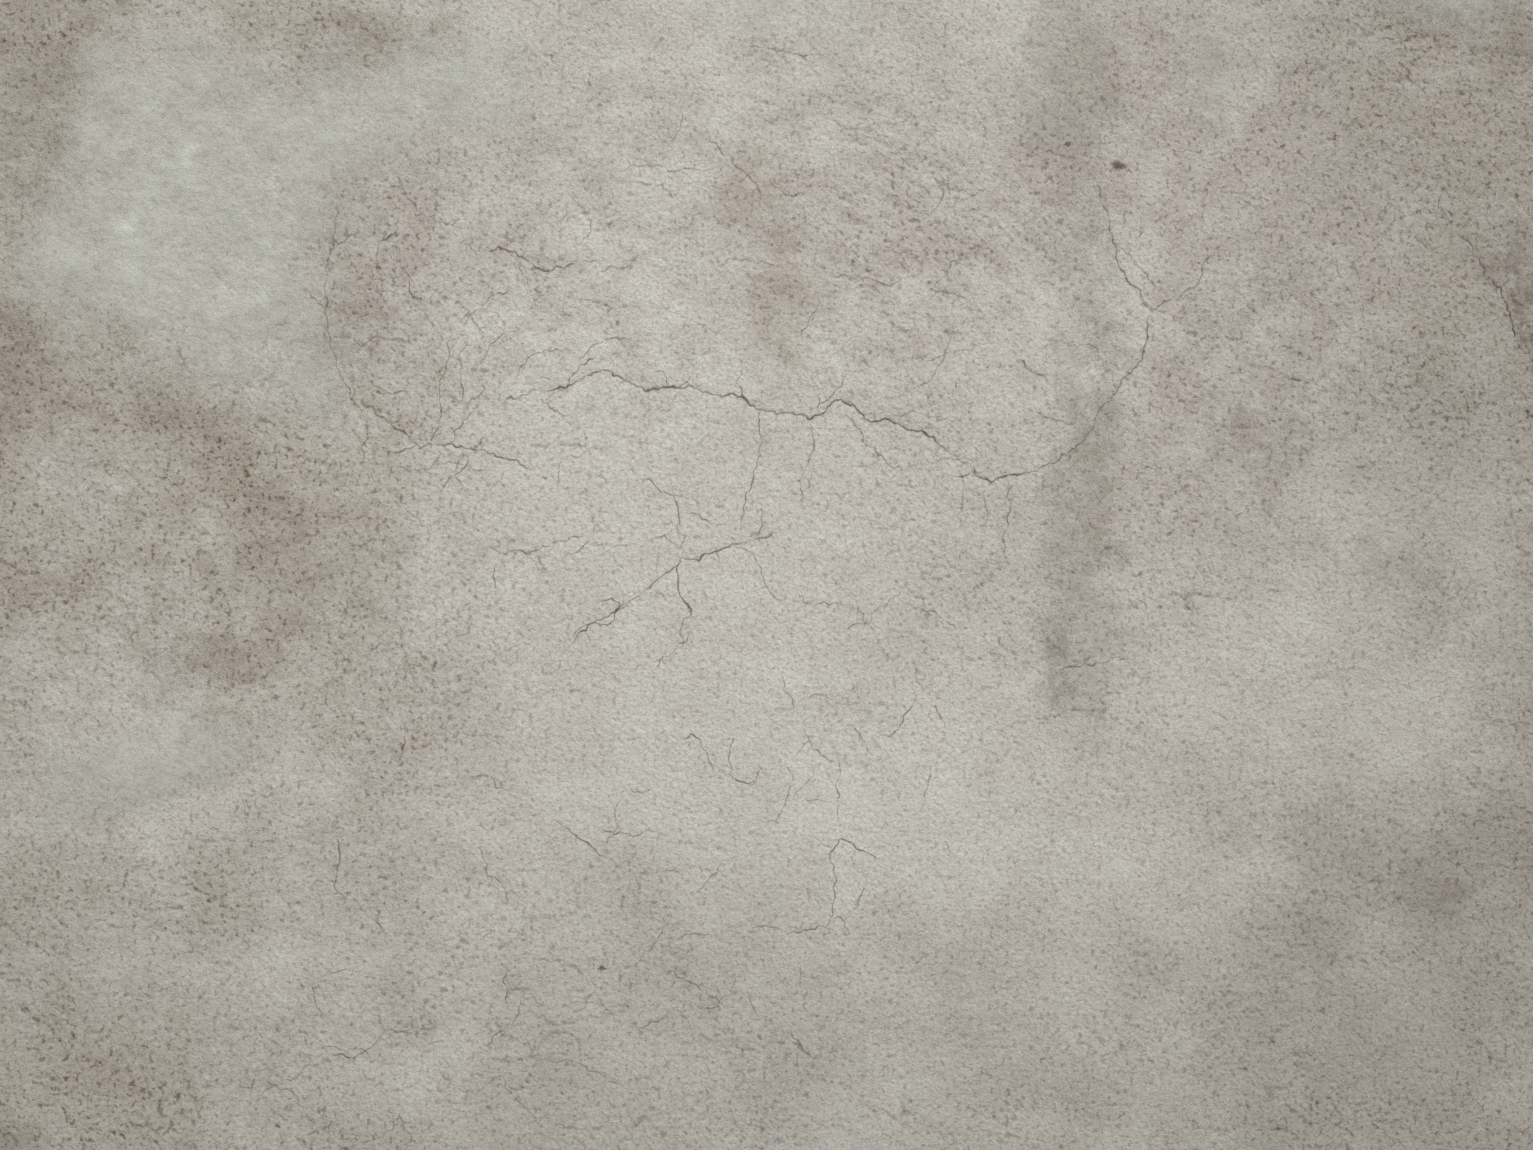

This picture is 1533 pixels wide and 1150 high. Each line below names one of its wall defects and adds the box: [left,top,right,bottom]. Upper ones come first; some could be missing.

crack [491,246,574,271]
crack [316,219,516,483]
crack [511,338,680,399]
crack [717,386,939,468]
crack [962,440,1084,530]
crack [648,465,767,667]
crack [575,598,623,639]